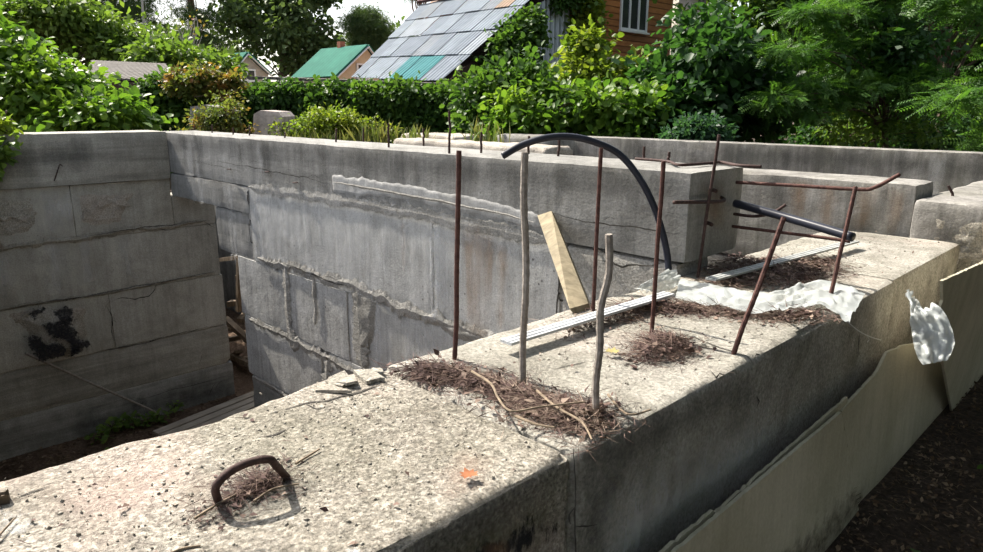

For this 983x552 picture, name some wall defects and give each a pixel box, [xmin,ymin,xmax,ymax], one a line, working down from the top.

damp [476,516,557,552]